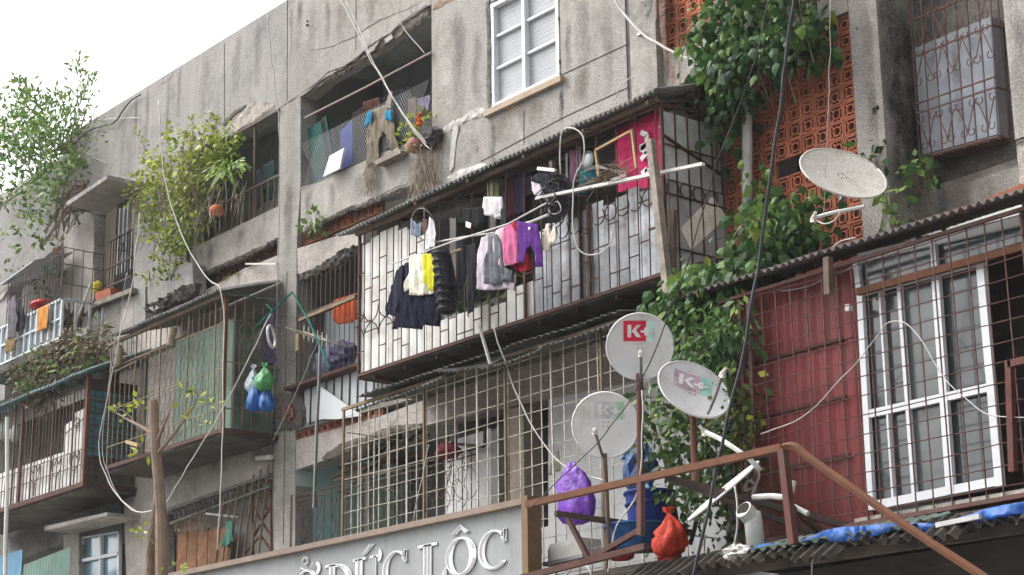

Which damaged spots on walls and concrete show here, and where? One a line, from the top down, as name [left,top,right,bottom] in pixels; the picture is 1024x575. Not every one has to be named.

spalling [223,102,276,133]
peeling [443,0,492,182]